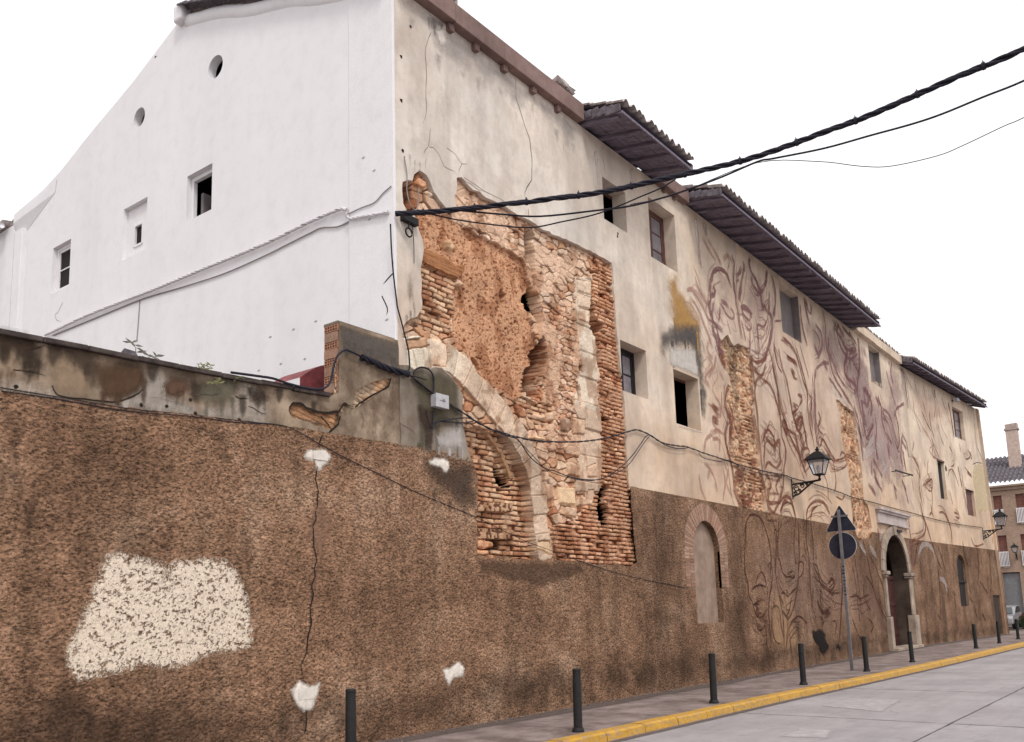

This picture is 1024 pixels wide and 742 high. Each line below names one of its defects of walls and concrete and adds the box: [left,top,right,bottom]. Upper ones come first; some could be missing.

crack [424,33,532,214]
damp [0,335,96,397]
damp [124,366,282,422]
flaking render [289,362,390,430]
crack [290,378,392,674]
spalling [402,173,636,566]
damp [670,281,699,375]
spalling [719,335,765,511]
spalling [836,400,870,539]